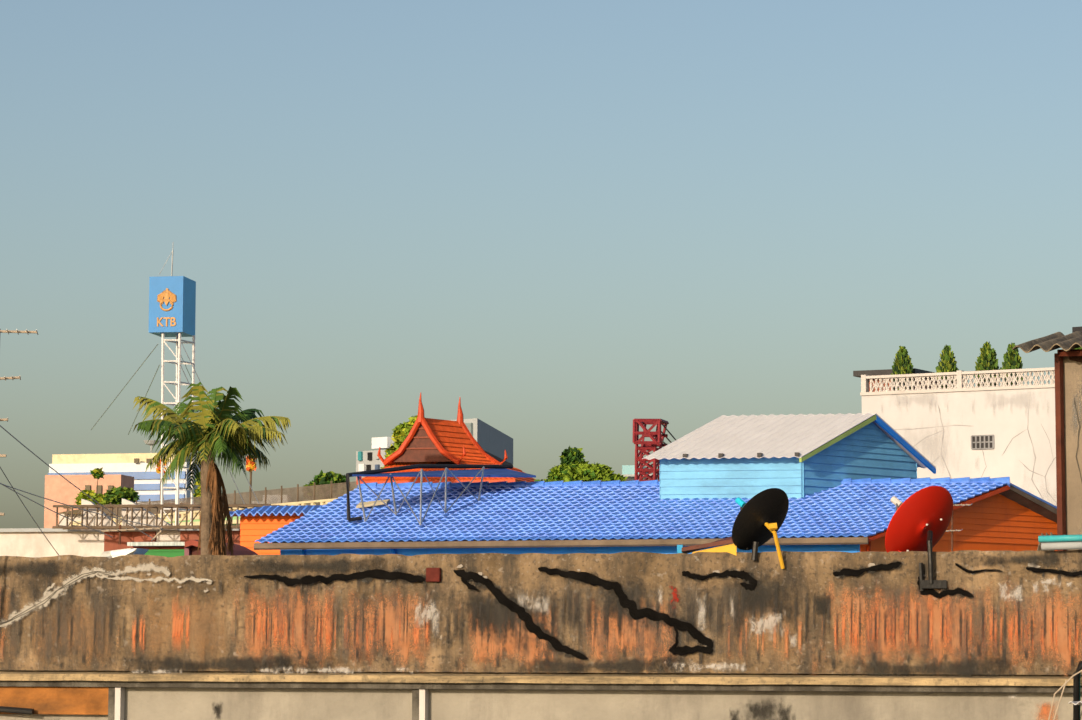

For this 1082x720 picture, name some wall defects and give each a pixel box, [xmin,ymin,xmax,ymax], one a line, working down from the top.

damp [0,559,89,600]
crack [244,568,426,586]
crack [682,568,758,591]
crack [833,561,1082,600]
corrosion [132,621,159,648]
damp [131,652,353,674]
corrosion [246,594,428,663]
corrosion [474,611,554,664]
crack [453,564,588,660]
crack [538,567,713,655]
corrosion [588,604,673,662]
corrosion [830,588,1081,667]